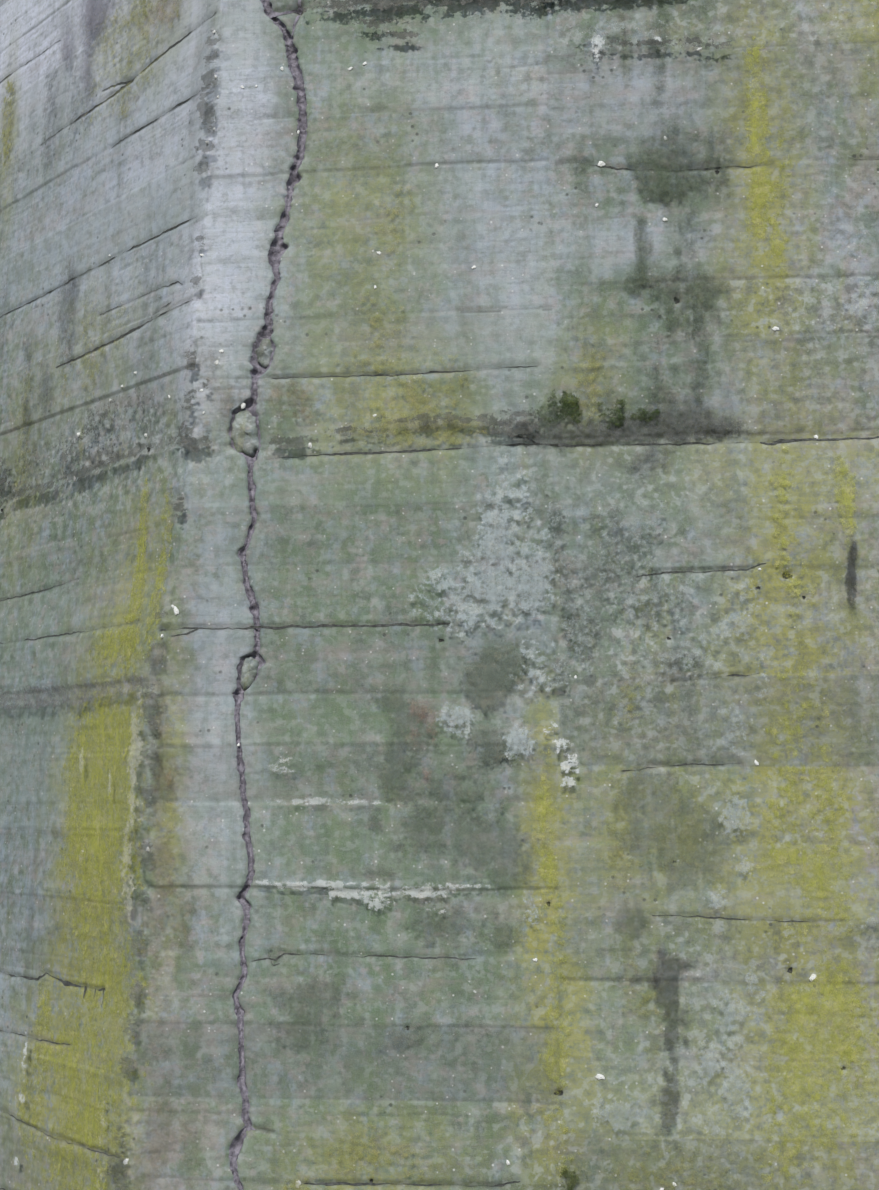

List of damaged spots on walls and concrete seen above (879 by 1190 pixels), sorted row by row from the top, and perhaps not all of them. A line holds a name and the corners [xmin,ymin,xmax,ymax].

leakage [591,34,605,61]
crack [41,12,216,148]
crack [1,217,196,317]
crack [56,281,198,368]
crack [496,435,879,447]
crack [1,578,79,601]
crack [161,0,485,1190]
crack [1,623,133,644]
crack [3,972,105,1007]
crack [4,1112,115,1156]
crack [304,1180,520,1188]